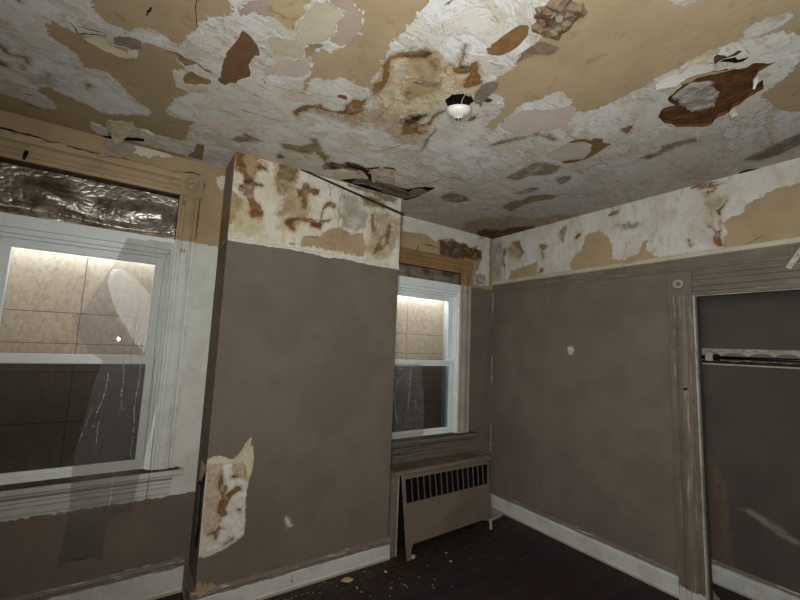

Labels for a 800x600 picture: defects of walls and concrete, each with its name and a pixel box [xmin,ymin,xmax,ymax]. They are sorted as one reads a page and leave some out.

peeling [0,0,429,160]
damp [293,45,482,135]
peeling [473,0,800,164]
peeling [216,175,242,224]
flaking render [492,158,800,285]
flaking render [194,461,246,553]